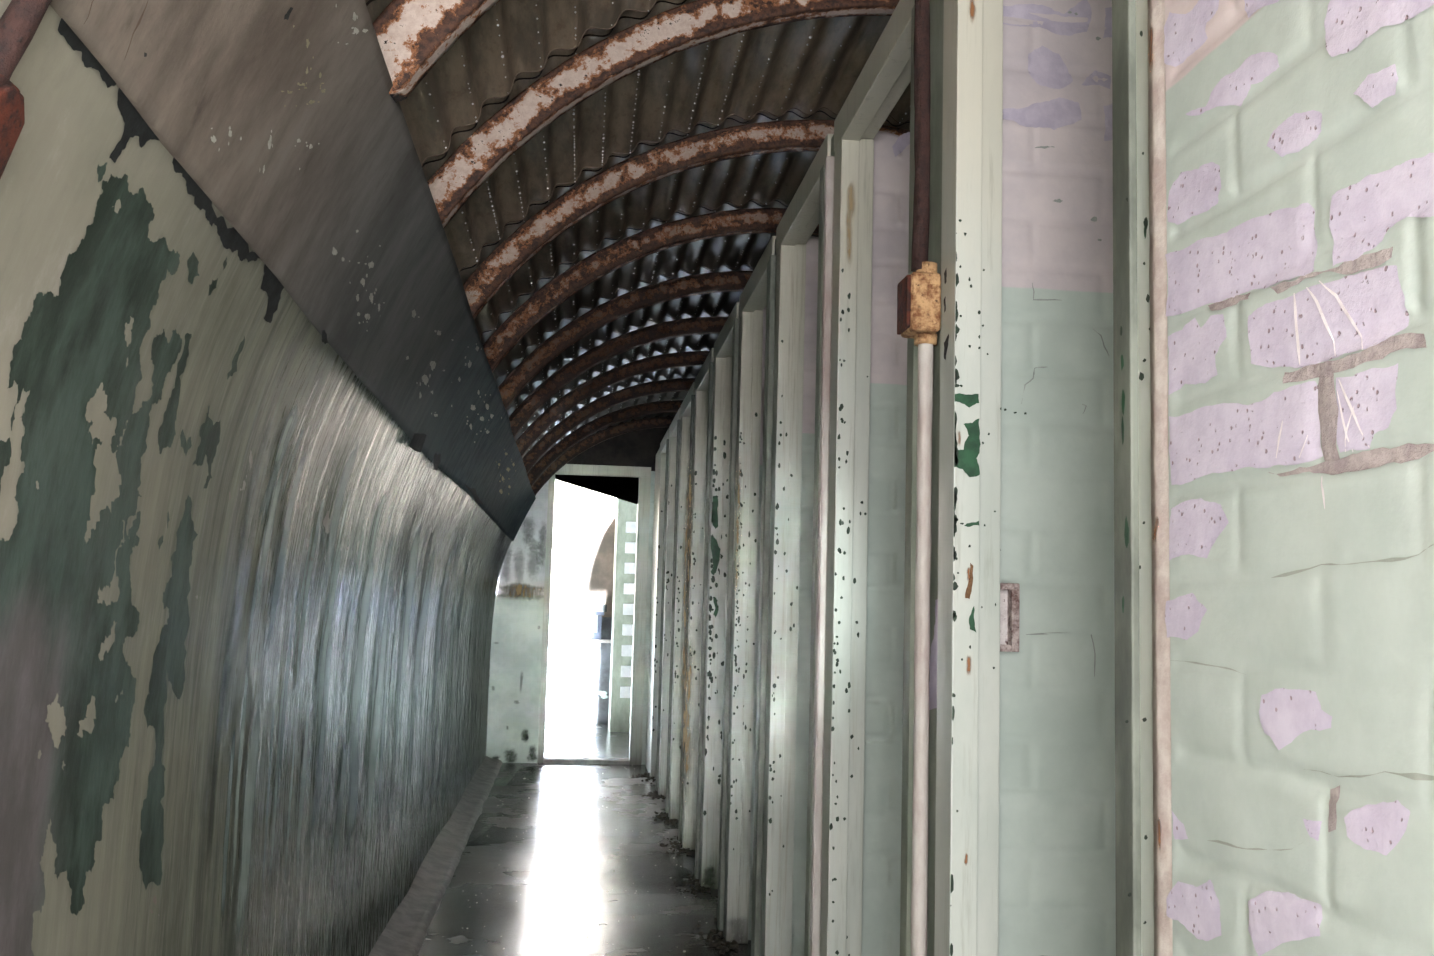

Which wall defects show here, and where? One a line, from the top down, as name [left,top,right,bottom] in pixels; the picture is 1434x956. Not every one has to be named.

peeling [1324,0,1434,57]
peeling [1186,52,1279,116]
peeling [1353,64,1398,108]
peeling [1267,110,1322,157]
peeling [929,252,996,720]
peeling [0,162,227,956]
crack [1272,544,1434,578]
crack [1172,660,1246,675]
peeling [1259,688,1332,750]
peeling [1303,786,1410,856]
peeling [1166,880,1222,941]
peeling [1248,891,1323,956]